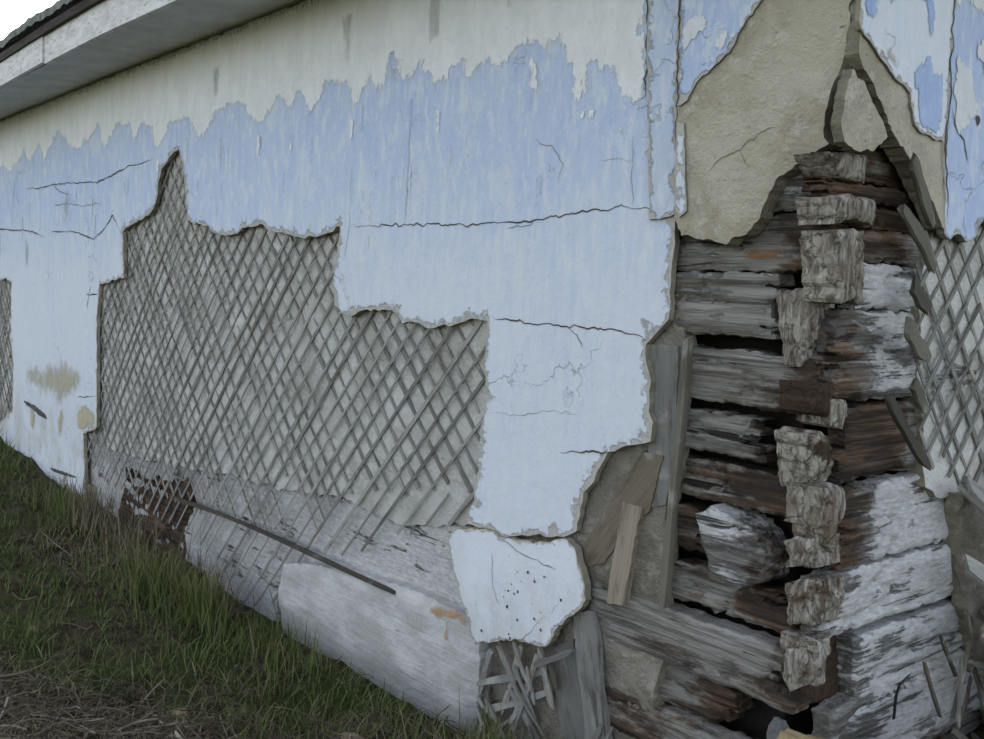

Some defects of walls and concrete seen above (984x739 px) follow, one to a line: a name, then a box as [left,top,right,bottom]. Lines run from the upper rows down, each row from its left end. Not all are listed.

crack [0,160,148,251]
crack [345,142,649,250]
flaking render [0,0,646,606]
crack [494,318,649,348]
flaking render [674,0,984,676]
crack [560,448,605,456]
flaking render [510,294,698,605]
corrosion [432,607,463,639]
flaking render [476,605,669,739]